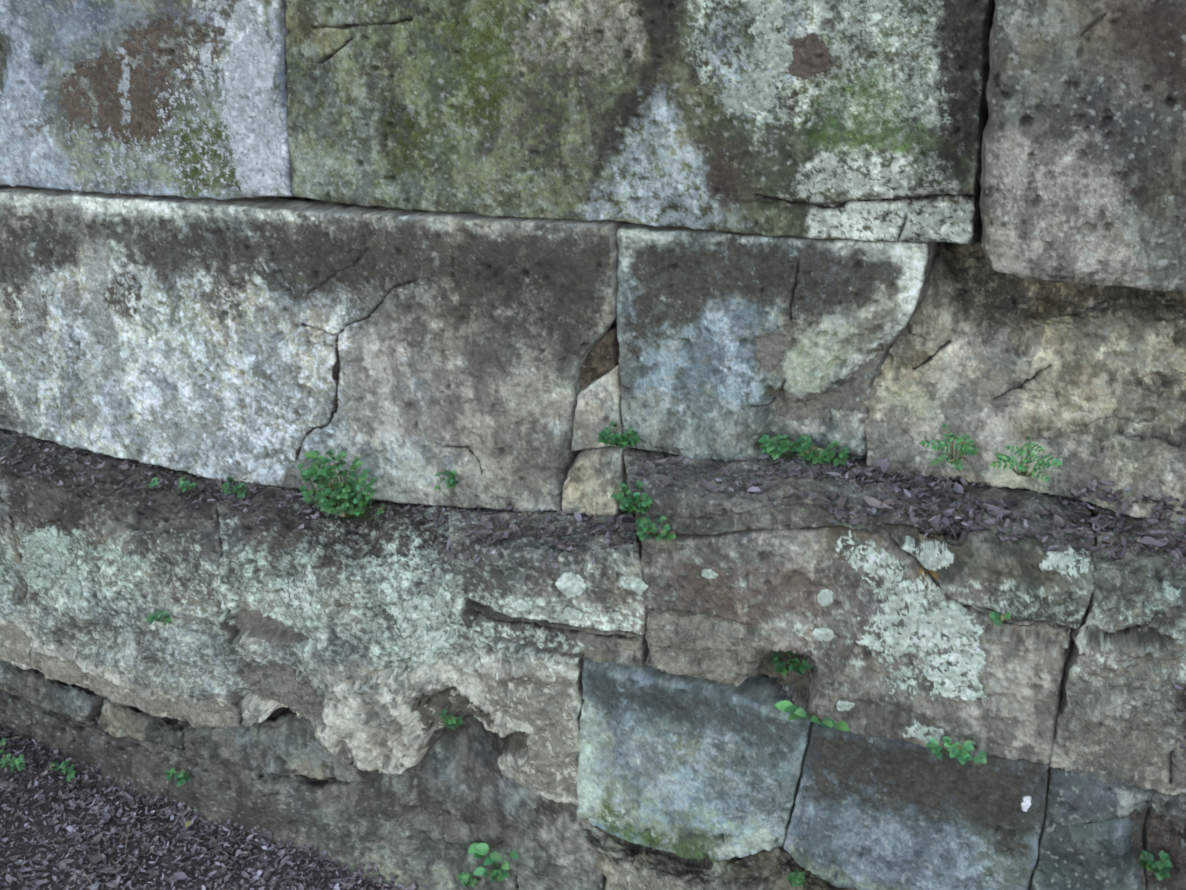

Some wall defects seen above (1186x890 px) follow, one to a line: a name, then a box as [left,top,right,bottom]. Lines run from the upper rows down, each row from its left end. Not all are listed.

crack [295,278,429,460]